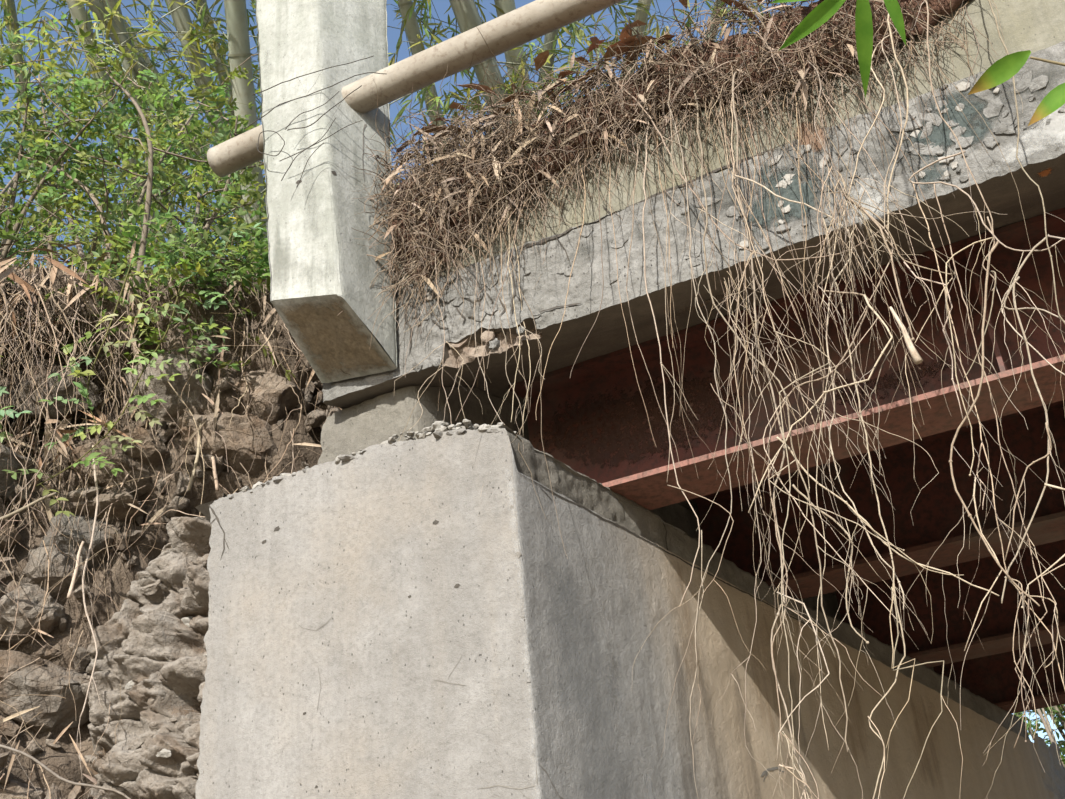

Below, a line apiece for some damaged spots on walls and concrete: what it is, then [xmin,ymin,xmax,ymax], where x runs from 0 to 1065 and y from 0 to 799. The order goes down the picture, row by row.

crack [360,124,368,184]
corrosion [828,358,952,405]
corrosion [534,370,742,469]